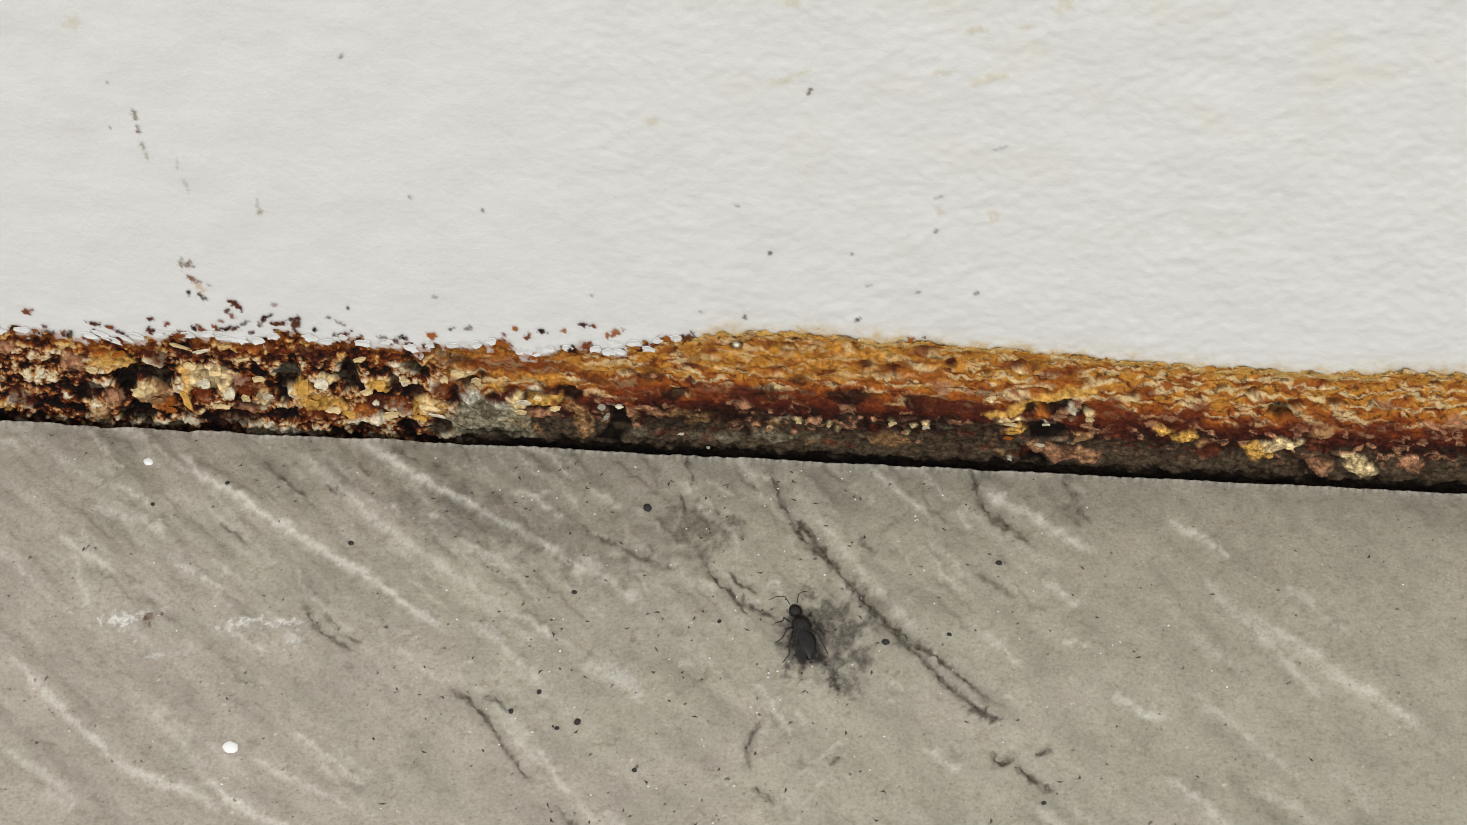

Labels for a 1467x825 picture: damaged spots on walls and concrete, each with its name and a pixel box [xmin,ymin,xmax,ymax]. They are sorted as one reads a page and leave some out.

rust [448,330,1467,447]